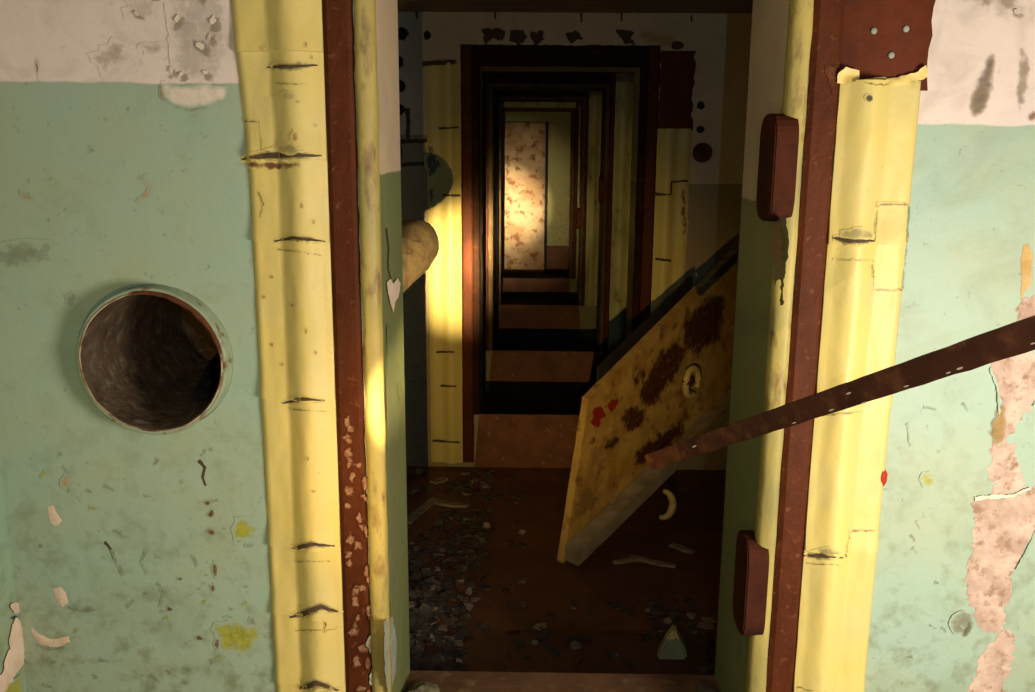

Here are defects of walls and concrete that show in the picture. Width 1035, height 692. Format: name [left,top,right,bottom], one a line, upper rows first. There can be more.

rust [768,218,789,305]
peeling [1016,244,1035,321]
peeling [342,415,397,692]
peeling [964,351,1035,692]
peeling [0,602,70,692]